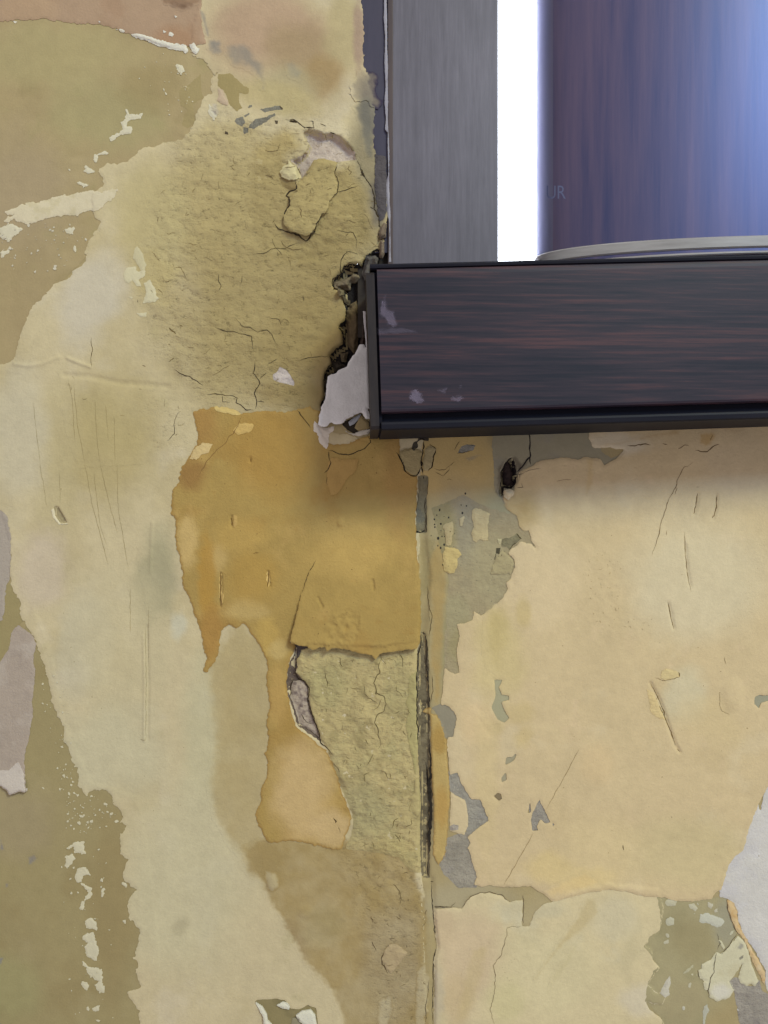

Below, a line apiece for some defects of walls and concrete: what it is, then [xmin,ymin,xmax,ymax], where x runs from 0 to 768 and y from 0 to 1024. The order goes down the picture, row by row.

peeling [0,18,283,364]
crack [151,158,328,475]
crack [258,161,380,285]
peeling [171,249,488,888]
peeling [432,433,619,674]
peeling [0,583,141,1024]
crack [290,584,532,1022]
peeling [492,680,509,723]
peeling [494,754,516,800]
peeling [529,800,554,831]
peeling [644,787,768,1024]